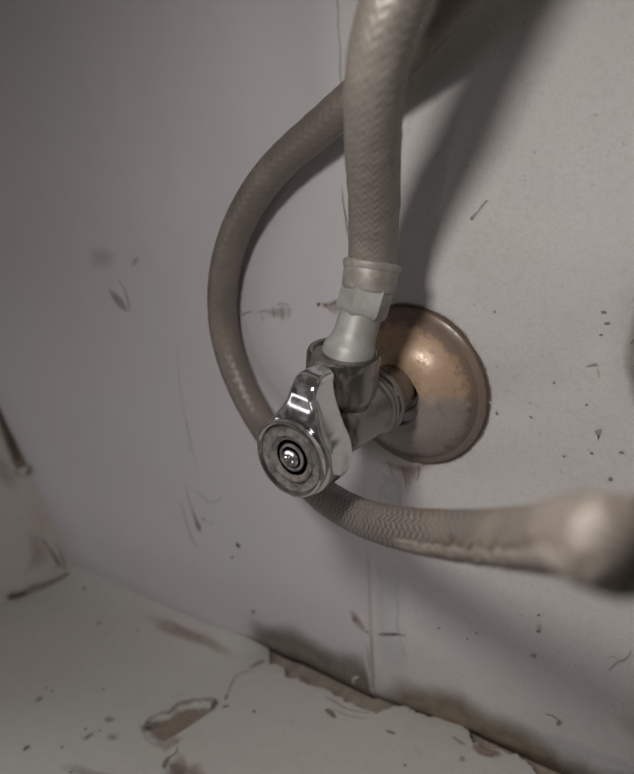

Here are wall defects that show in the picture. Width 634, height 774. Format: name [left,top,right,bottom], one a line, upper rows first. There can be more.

rust [373,303,491,465]
spalling [144,694,217,774]